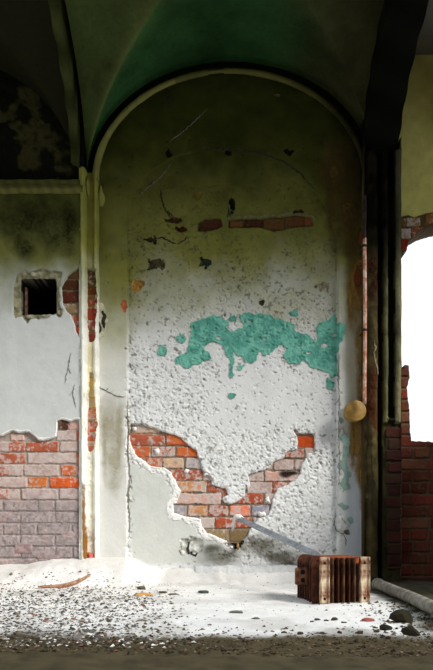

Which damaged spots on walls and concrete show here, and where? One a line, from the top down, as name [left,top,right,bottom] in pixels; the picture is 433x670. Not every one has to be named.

spalling [198,198,315,232]
spalling [14,269,108,342]
peeling [175,300,345,390]
spalling [0,373,98,565]
spalling [124,424,315,557]